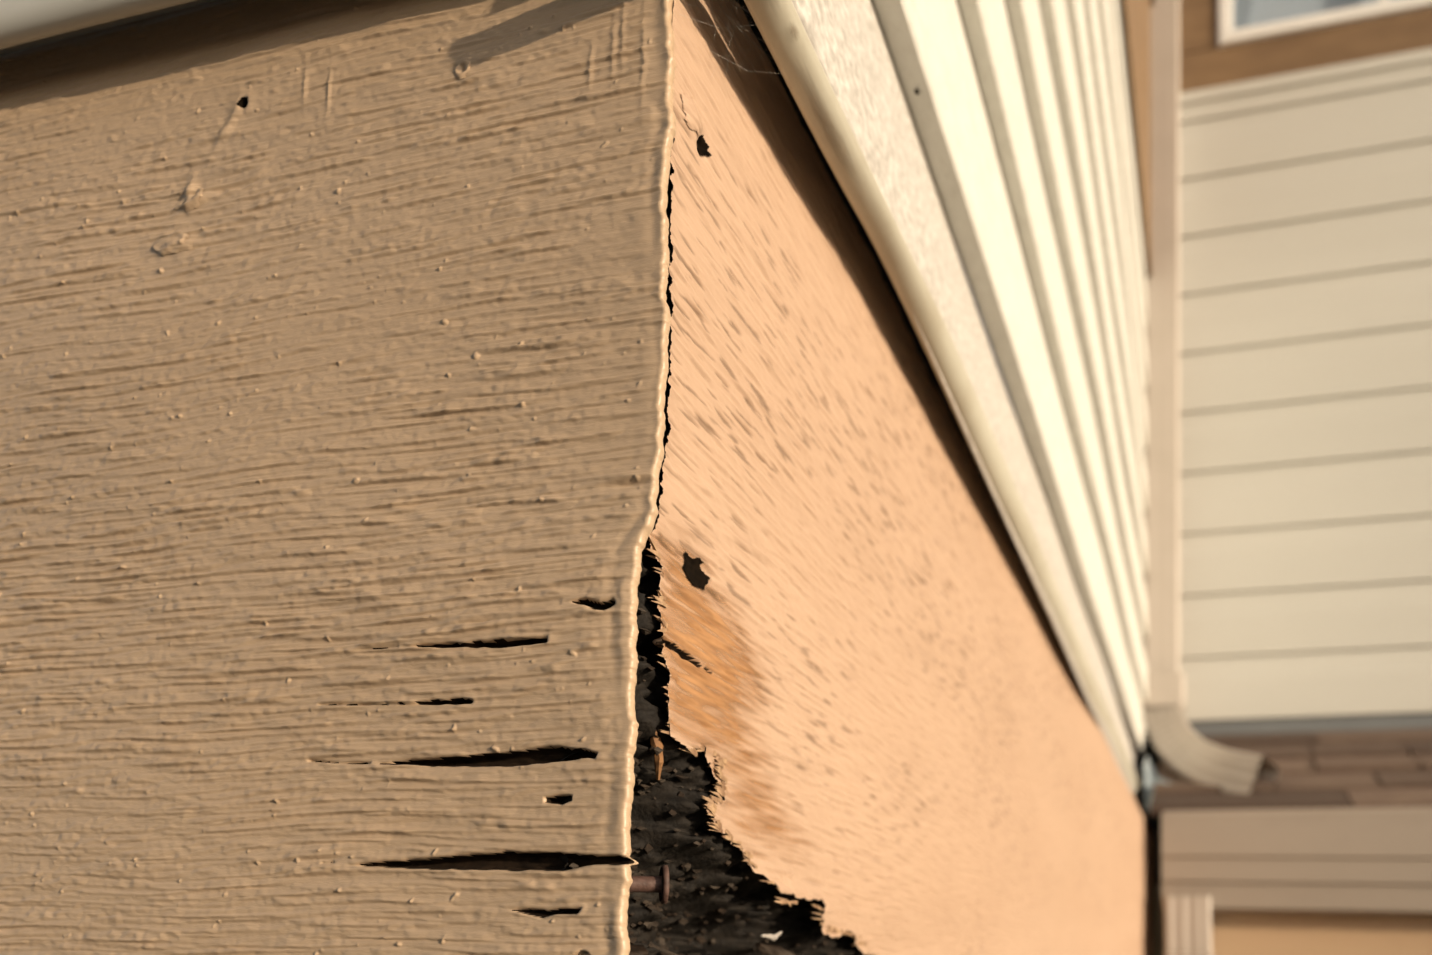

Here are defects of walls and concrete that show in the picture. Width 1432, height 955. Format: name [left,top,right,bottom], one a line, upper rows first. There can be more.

crack [373,638,548,649]
peeling [658,546,783,831]
crack [316,746,597,805]
crack [331,852,635,871]
crack [512,909,581,918]